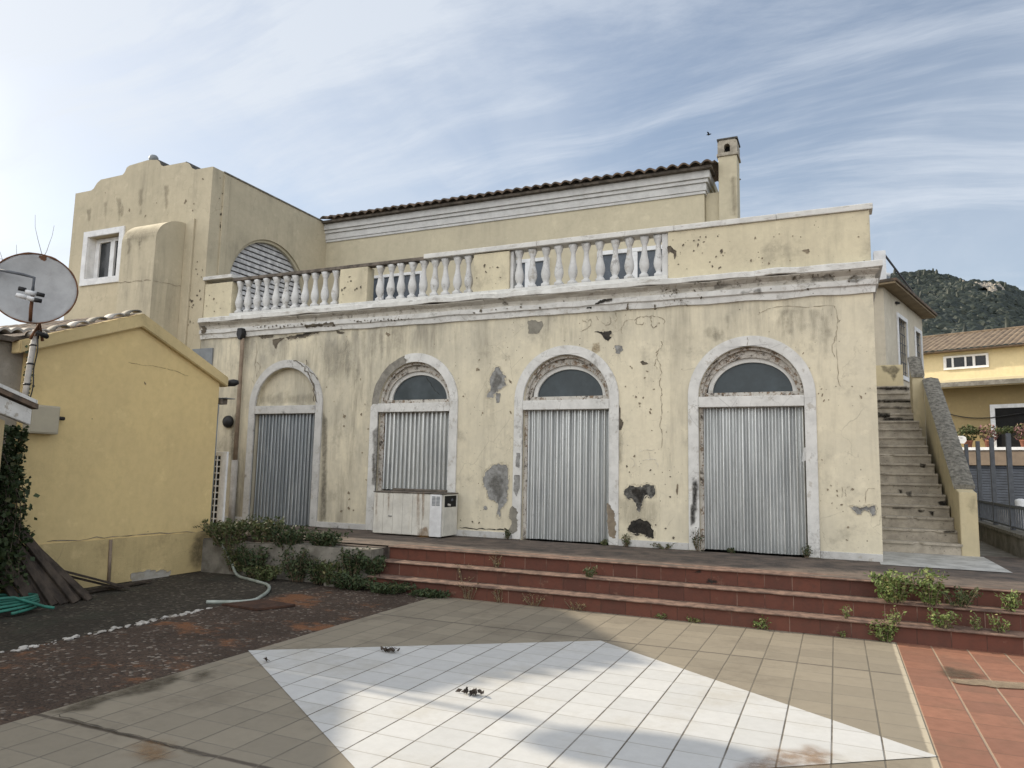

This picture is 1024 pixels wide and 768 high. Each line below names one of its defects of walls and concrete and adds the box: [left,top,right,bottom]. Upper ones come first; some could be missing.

flaking render [528,307,543,334]
peeling [476,359,512,403]
crack [580,313,664,467]
peeling [460,453,520,534]
flaking render [607,455,675,540]
peeling [827,485,878,517]